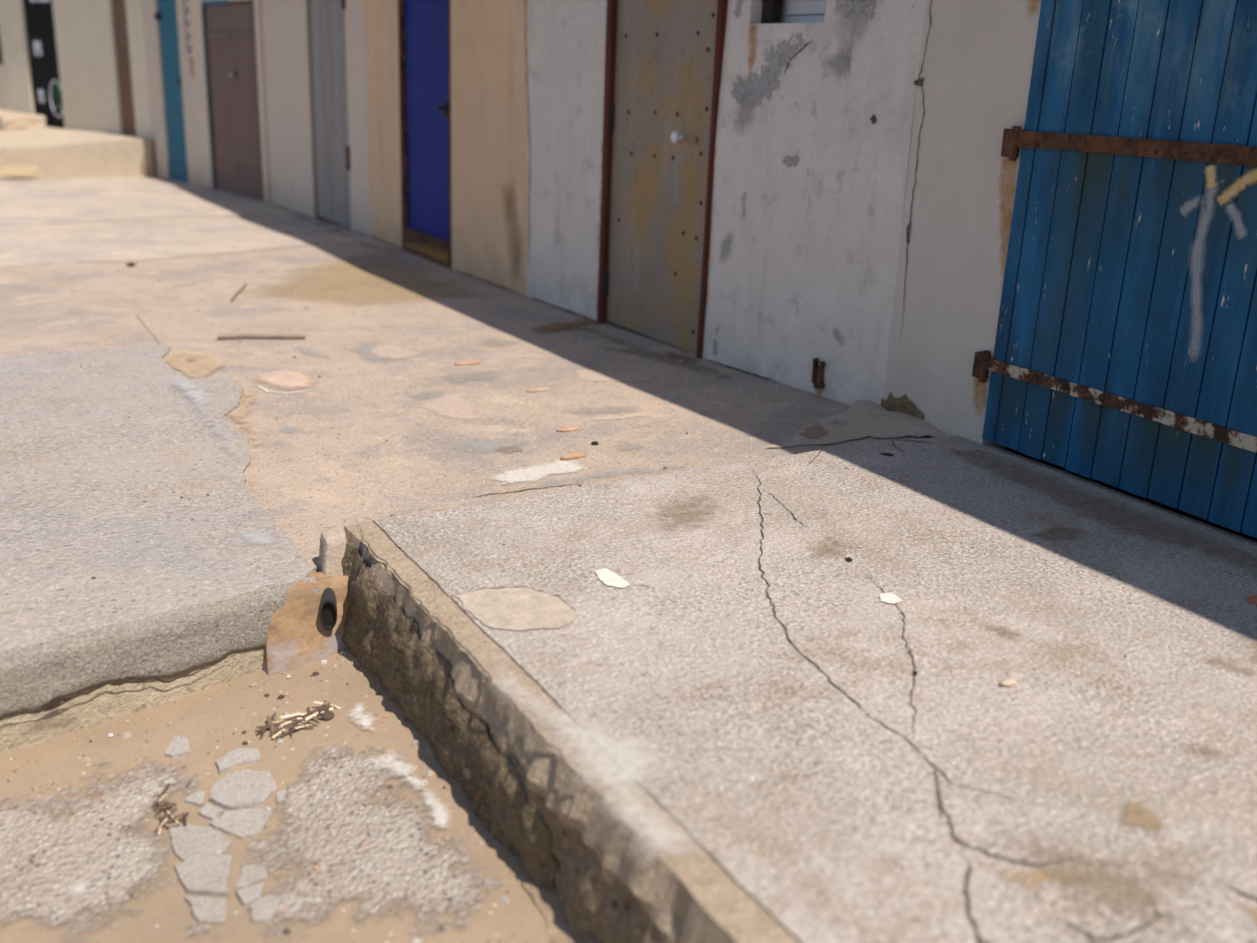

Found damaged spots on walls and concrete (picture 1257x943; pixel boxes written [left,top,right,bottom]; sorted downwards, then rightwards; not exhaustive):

peeling [732,34,809,127]
crack [900,1,932,335]
rust [1001,160,1015,261]
peeling [165,736,192,759]
crack [749,463,1076,943]
peeling [170,748,287,924]
crack [1052,895,1162,943]